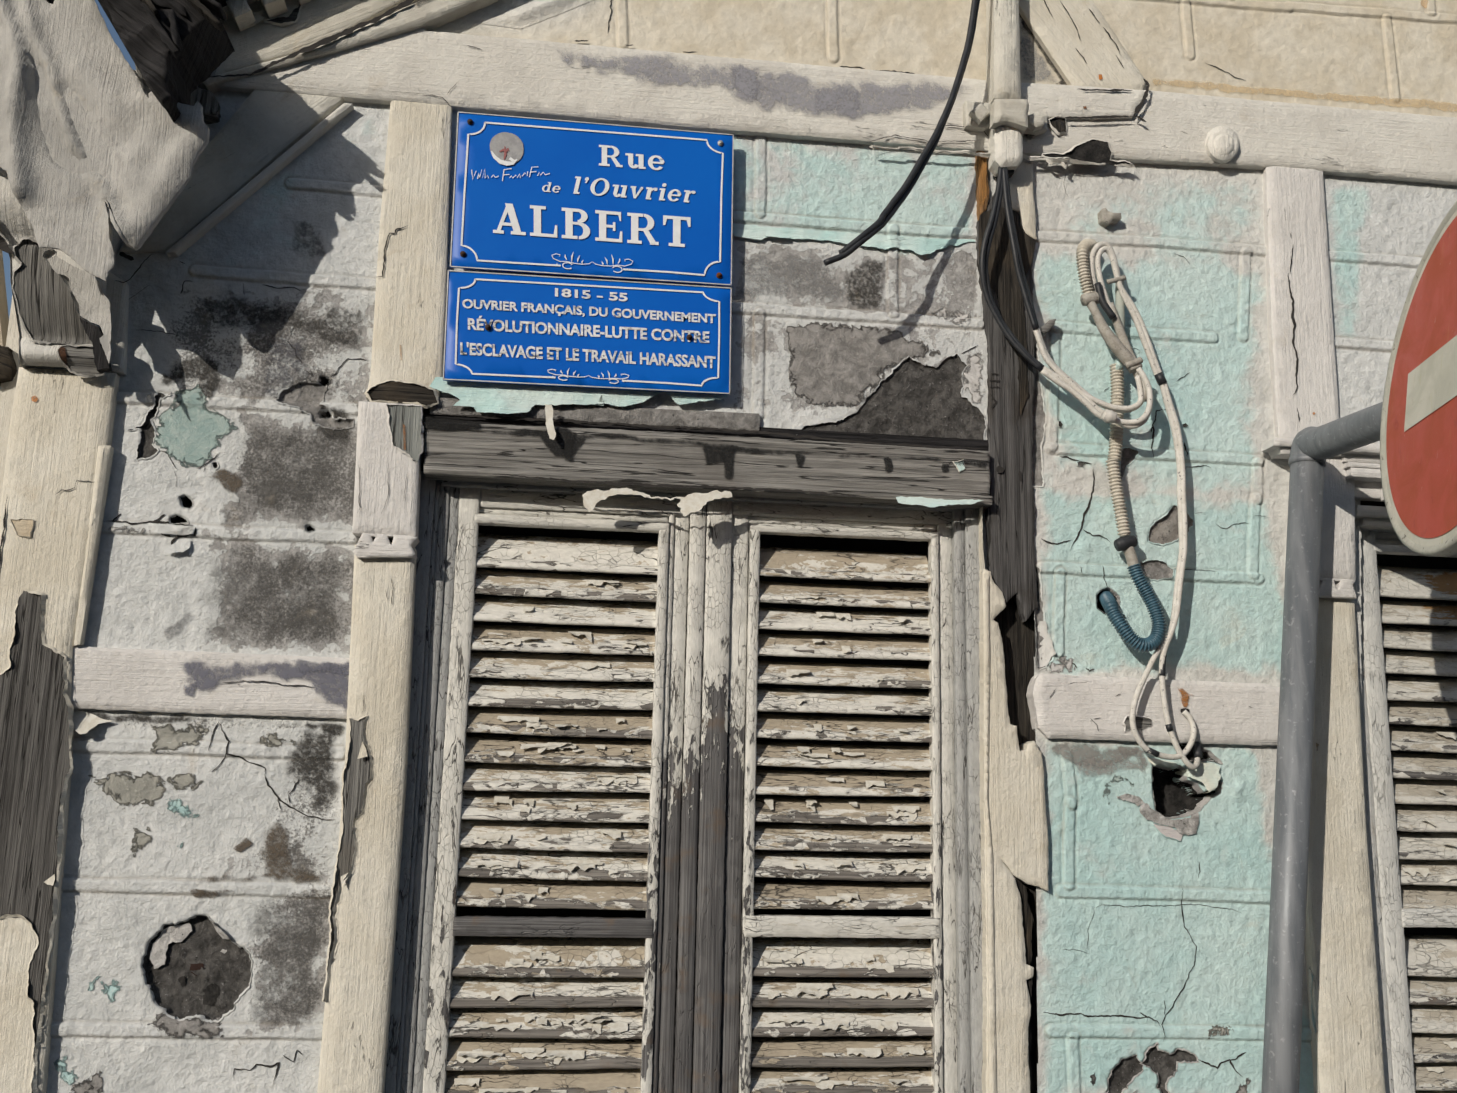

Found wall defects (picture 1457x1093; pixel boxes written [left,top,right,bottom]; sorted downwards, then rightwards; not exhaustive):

leakage [564,55,951,118]
peeling [128,384,238,468]
leakage [317,409,349,439]
spalling [786,322,987,440]
crack [1288,248,1300,421]
leakage [213,469,242,492]
crack [219,679,310,687]
crack [208,722,335,820]
peeling [0,591,212,1093]
spalling [140,914,252,1039]
crack [1044,863,1241,1035]
spalling [1090,1041,1199,1093]